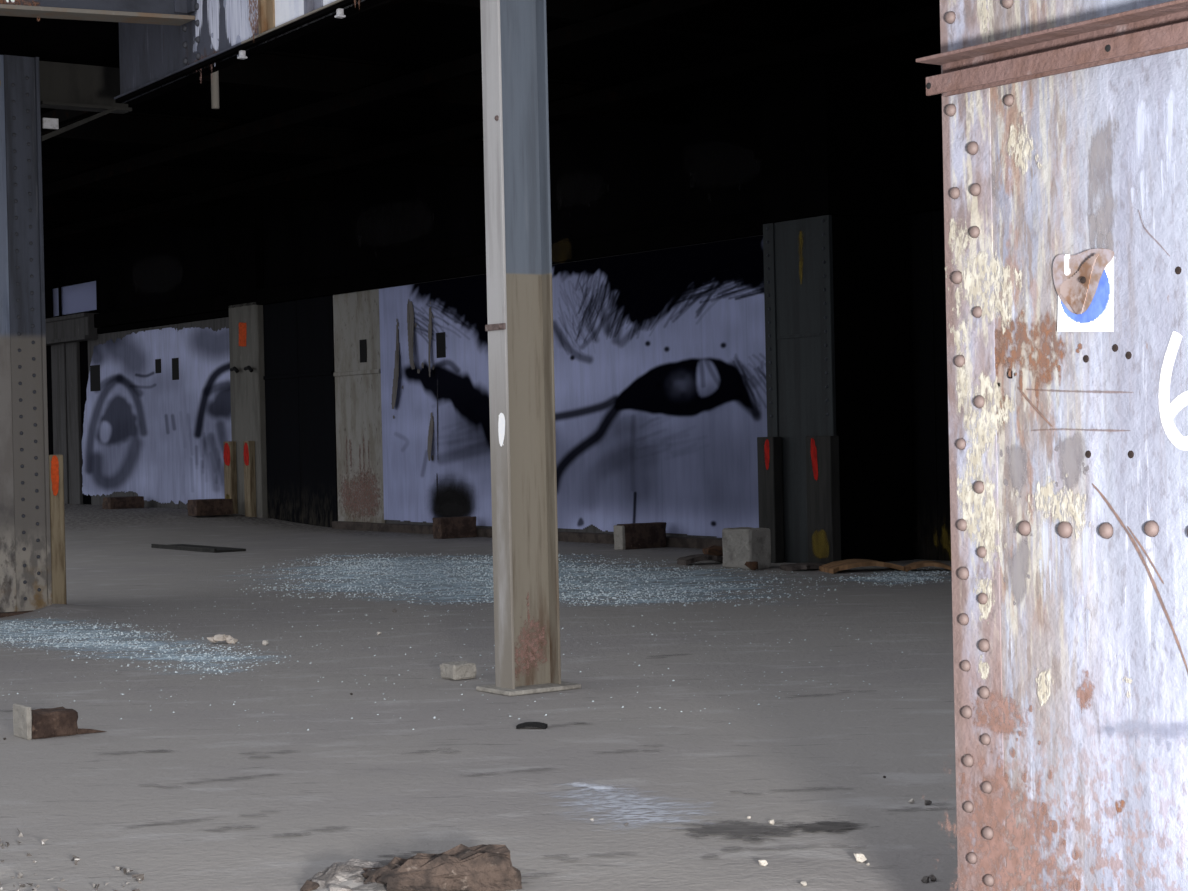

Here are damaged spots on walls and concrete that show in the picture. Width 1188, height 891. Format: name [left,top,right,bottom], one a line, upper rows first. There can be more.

peeling [945,218,1091,624]
rust [994,312,1082,403]
rust [1077,671,1095,714]
rust [941,693,1081,891]